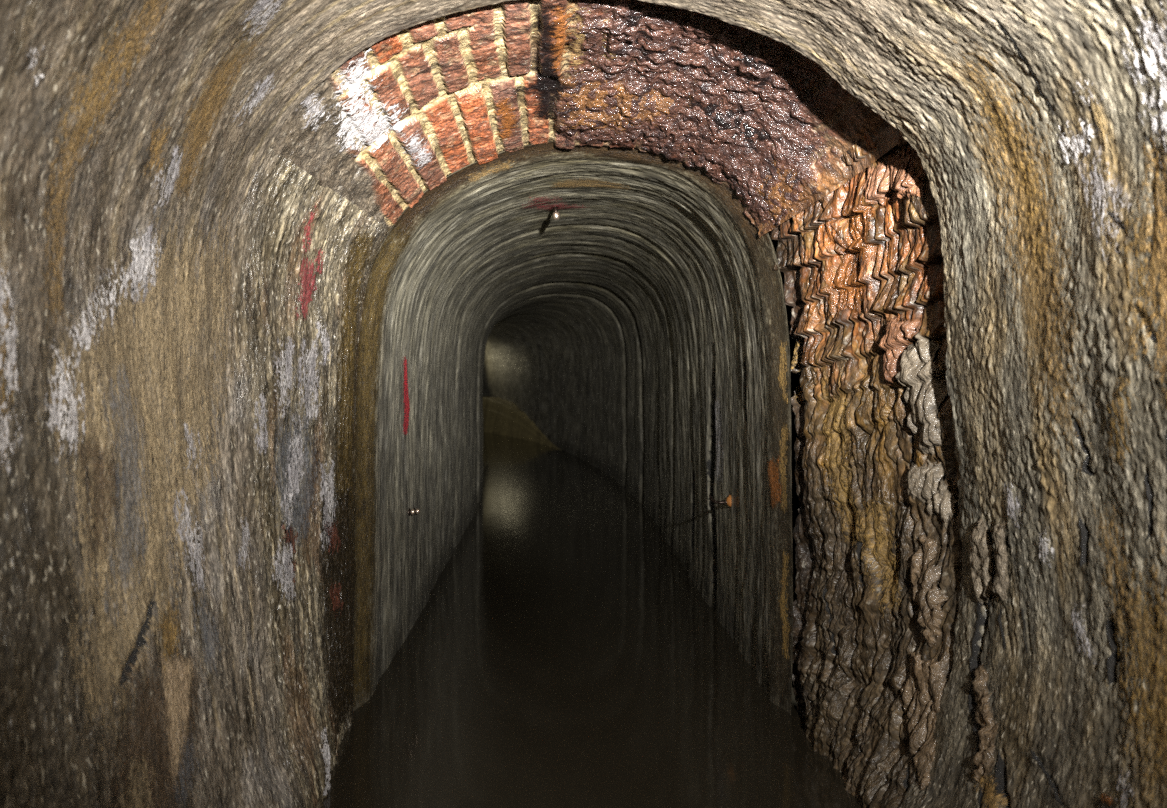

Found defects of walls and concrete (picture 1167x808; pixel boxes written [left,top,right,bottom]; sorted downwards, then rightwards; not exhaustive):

corrosion [494,98,521,139]
corrosion [550,5,590,71]
water stain [1123,2,1167,158]
water stain [1058,122,1124,253]
water stain [255,0,835,717]
water stain [239,521,251,570]
crack [968,531,1063,808]